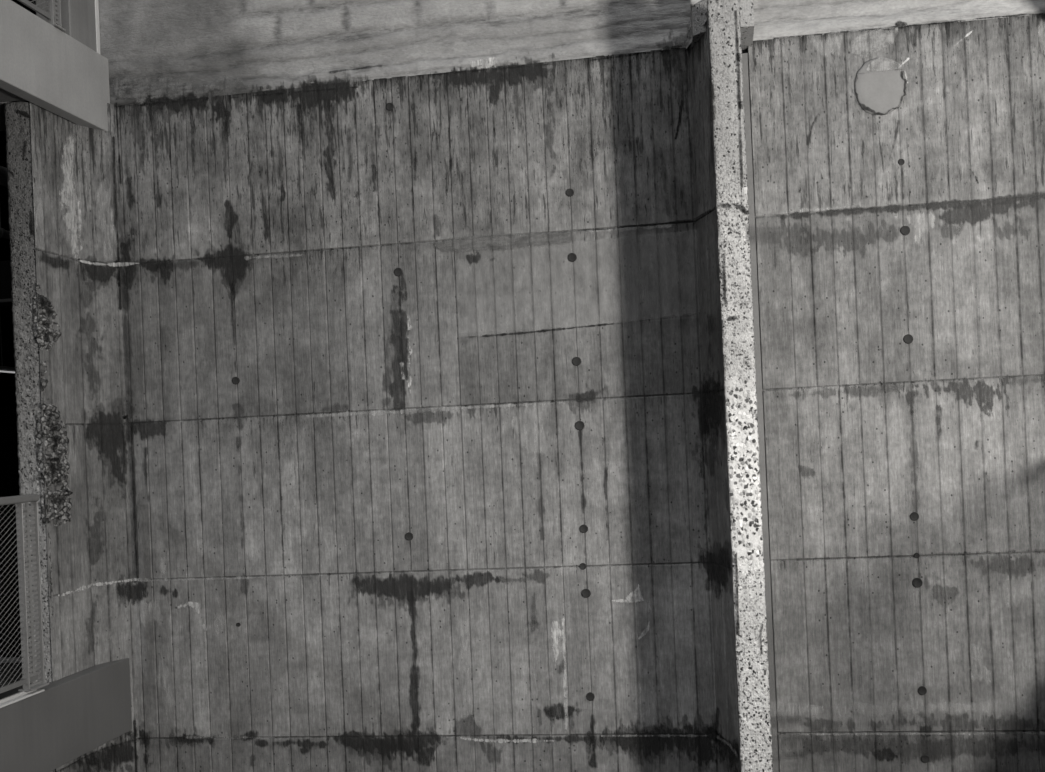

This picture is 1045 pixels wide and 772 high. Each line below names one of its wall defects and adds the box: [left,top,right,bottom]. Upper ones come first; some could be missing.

damp [133,91,231,133]
damp [251,76,359,200]
damp [432,57,553,116]
damp [41,136,249,337]
damp [750,192,1045,254]
damp [38,295,55,342]
damp [383,273,445,423]
damp [569,388,607,408]
damp [692,374,722,528]
damp [58,578,148,606]
damp [698,545,732,596]
damp [235,571,500,765]